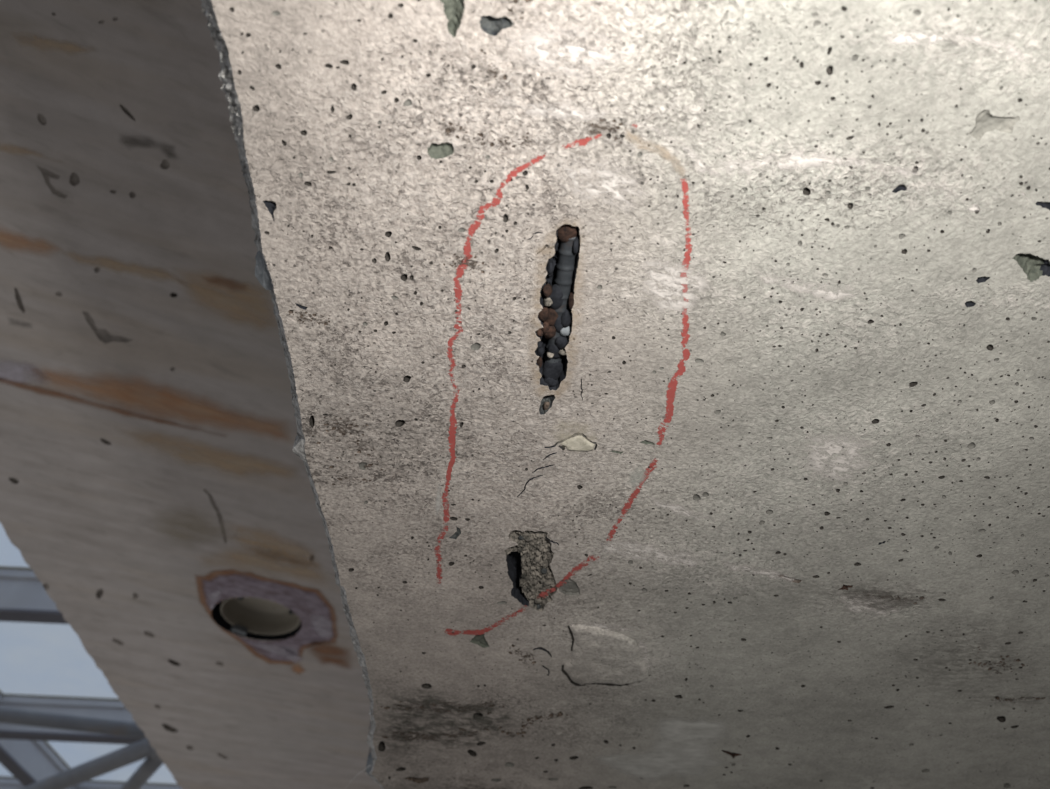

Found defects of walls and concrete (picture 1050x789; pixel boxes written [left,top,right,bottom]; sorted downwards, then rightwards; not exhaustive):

spalling [502,217,670,456]
spalling [497,513,592,636]